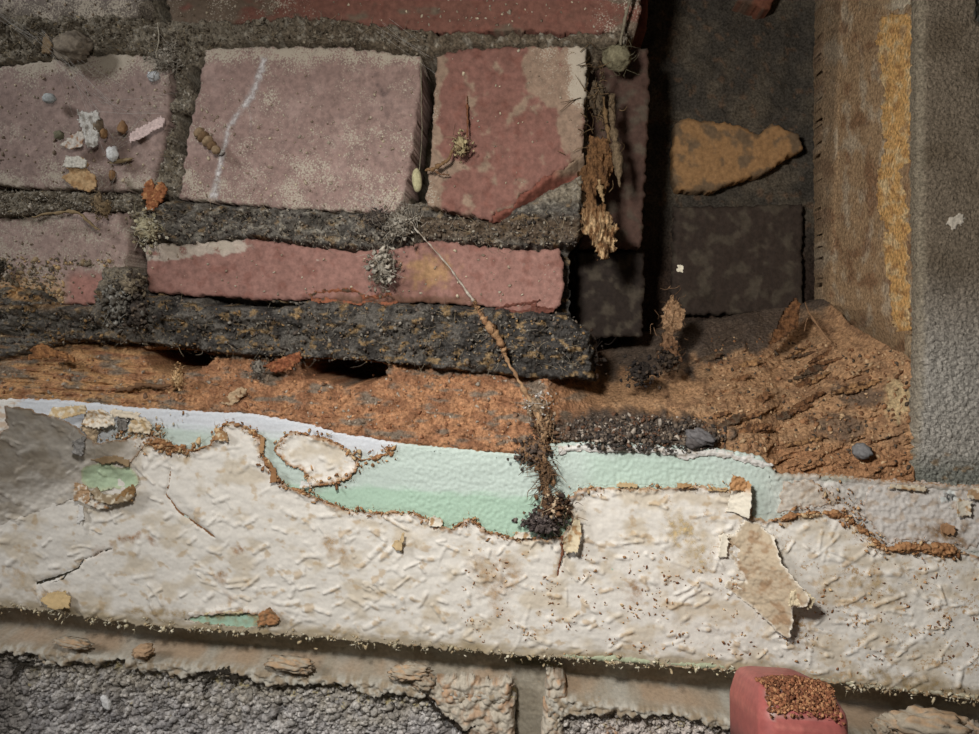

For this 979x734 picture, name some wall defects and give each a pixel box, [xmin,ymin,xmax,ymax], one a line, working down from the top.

peeling [0,402,14,431]
peeling [49,405,152,443]
peeling [73,455,139,523]
peeling [164,414,564,540]
peeling [556,442,979,554]
peeling [718,533,730,558]
peeling [788,590,816,610]